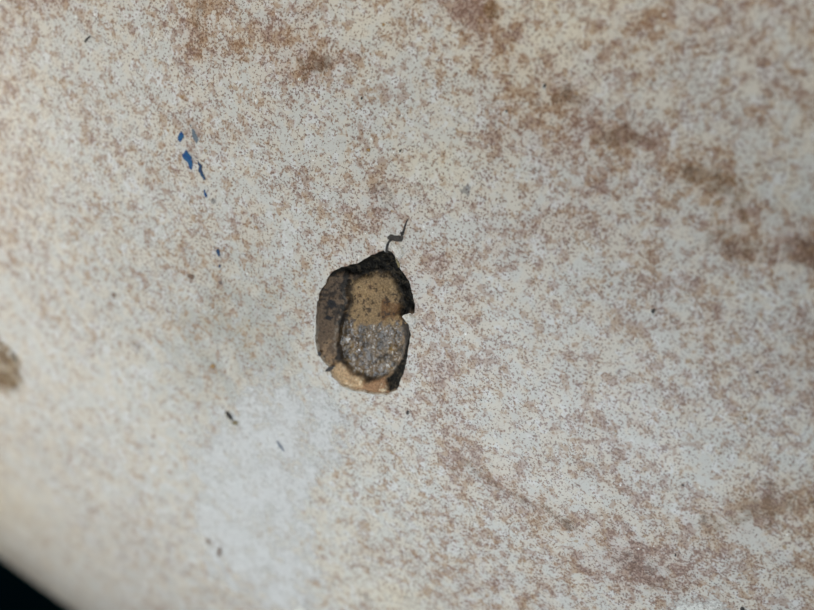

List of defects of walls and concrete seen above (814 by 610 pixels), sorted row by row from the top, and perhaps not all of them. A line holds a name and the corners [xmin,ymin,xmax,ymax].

damp [0,341,22,390]